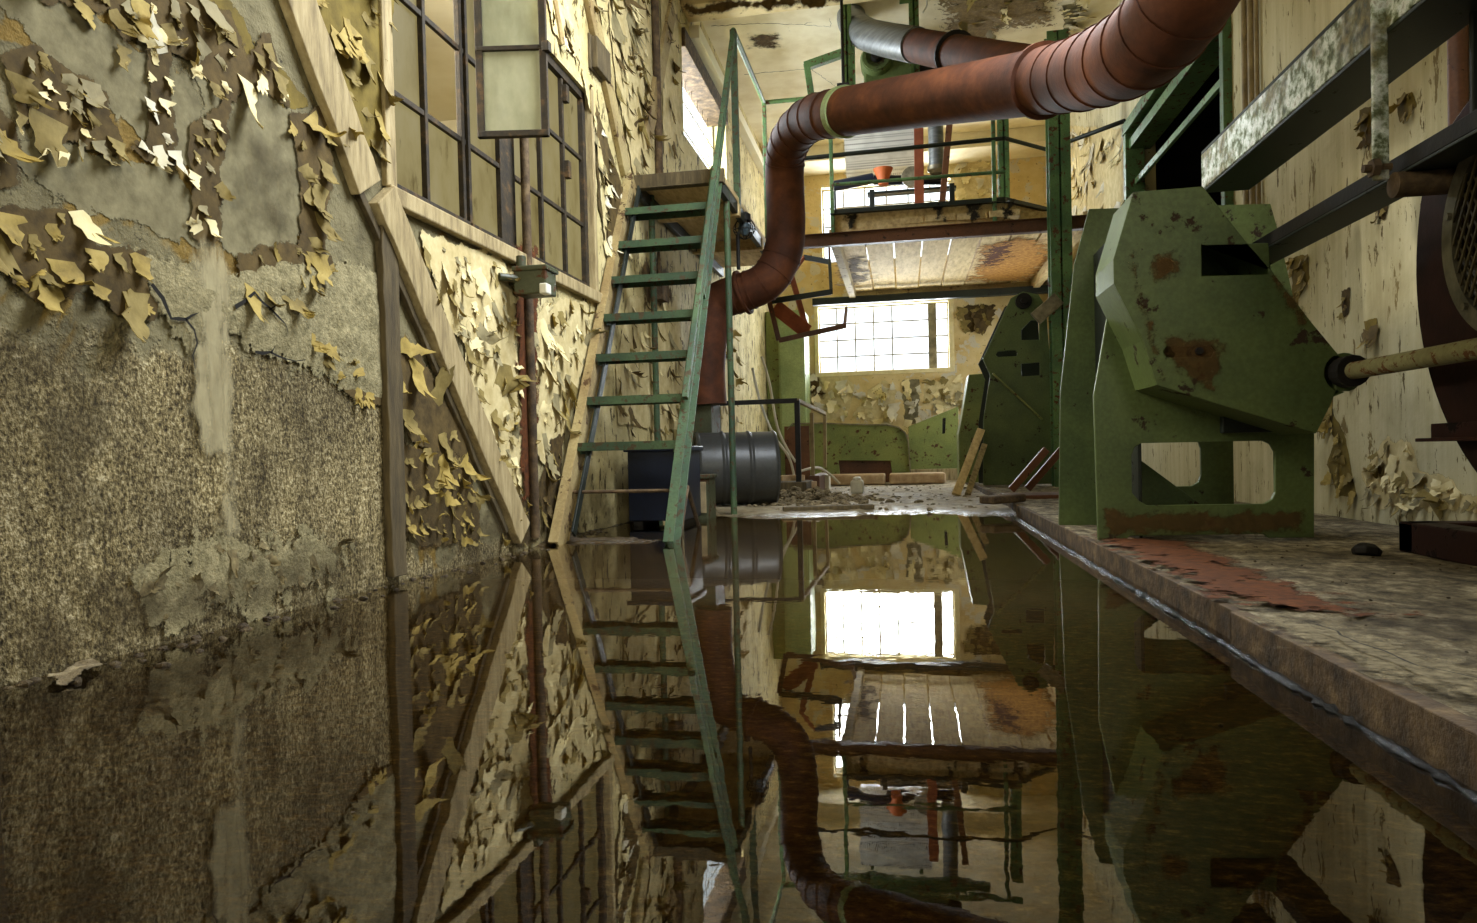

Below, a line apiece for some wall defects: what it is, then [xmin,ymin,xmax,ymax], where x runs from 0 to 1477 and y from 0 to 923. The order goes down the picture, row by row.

peeling [548,0,686,265]
peeling [1354,107,1372,152]
peeling [1389,92,1416,124]
spalling [0,0,404,410]
peeling [1370,205,1389,224]
peeling [1286,254,1310,306]
peeling [1336,287,1379,349]
peeling [400,229,683,548]
peeling [1317,399,1477,521]